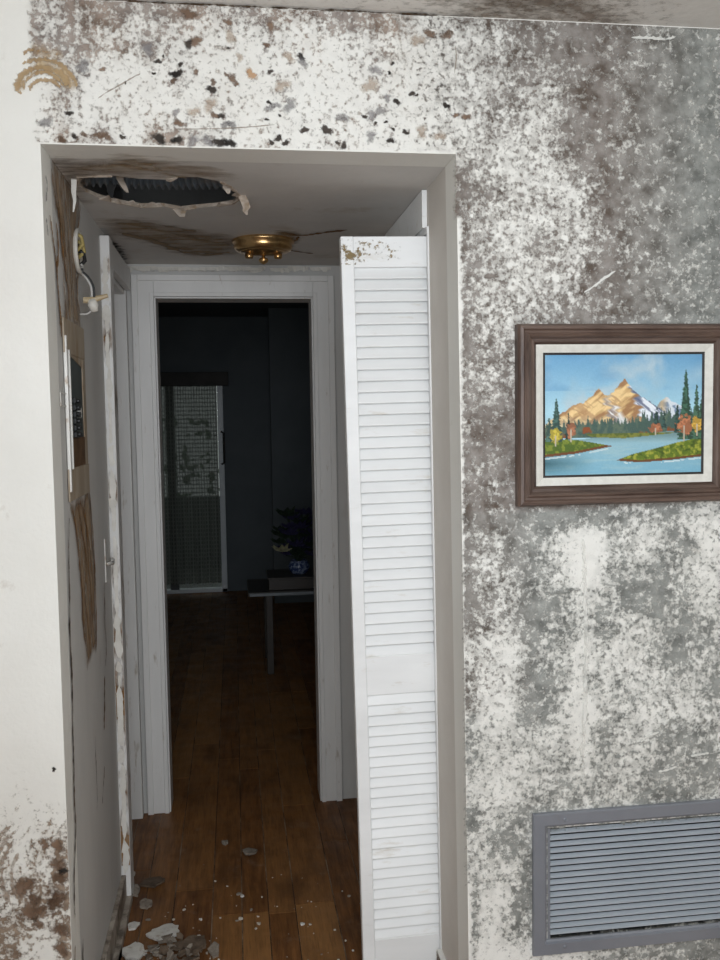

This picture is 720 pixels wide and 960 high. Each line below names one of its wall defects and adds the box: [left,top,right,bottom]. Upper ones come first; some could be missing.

leakage [179,36,204,55]
leakage [39,108,120,144]
leakage [141,59,248,147]
leakage [247,62,298,120]
leakage [318,77,404,150]
spalling [71,175,196,217]
spalling [217,181,250,215]
leakage [46,167,80,337]
leakage [340,242,396,265]
leakage [71,492,107,660]
leakage [0,820,72,960]
leakage [580,938,720,960]